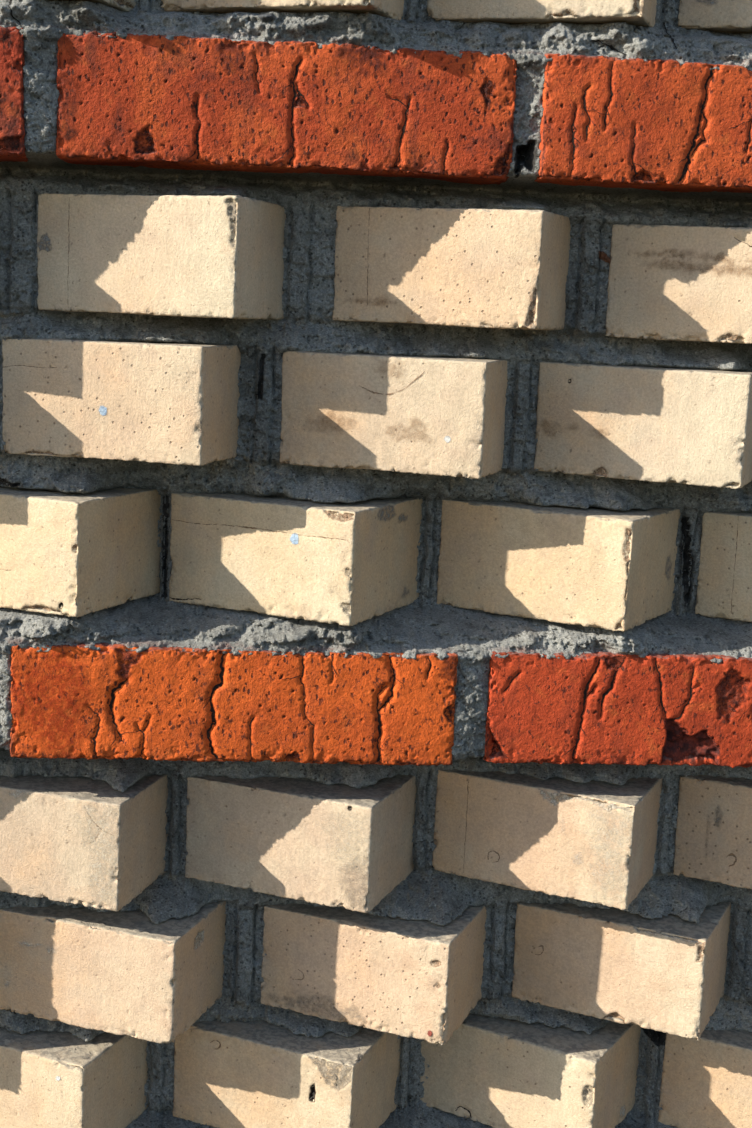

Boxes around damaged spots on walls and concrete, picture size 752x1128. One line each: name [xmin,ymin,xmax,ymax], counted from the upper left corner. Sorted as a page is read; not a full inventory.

crack [570,39,752,183]
crack [85,679,150,757]
crack [202,654,225,759]
crack [376,657,431,762]
crack [563,659,624,760]
crack [650,660,698,721]
spalling [661,718,720,765]
spalling [716,669,750,721]